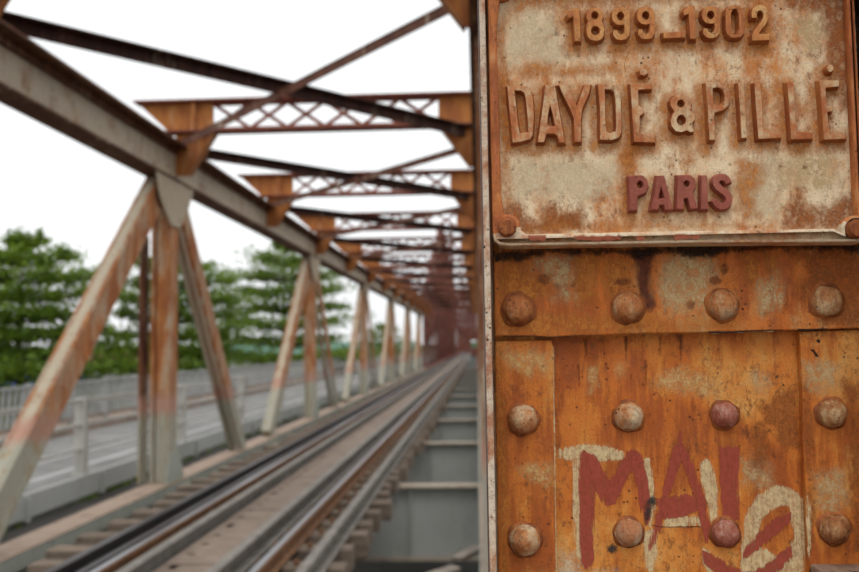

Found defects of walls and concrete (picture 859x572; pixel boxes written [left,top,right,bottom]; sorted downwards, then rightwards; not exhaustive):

corrosion [497,0,856,242]
corrosion [499,251,661,352]